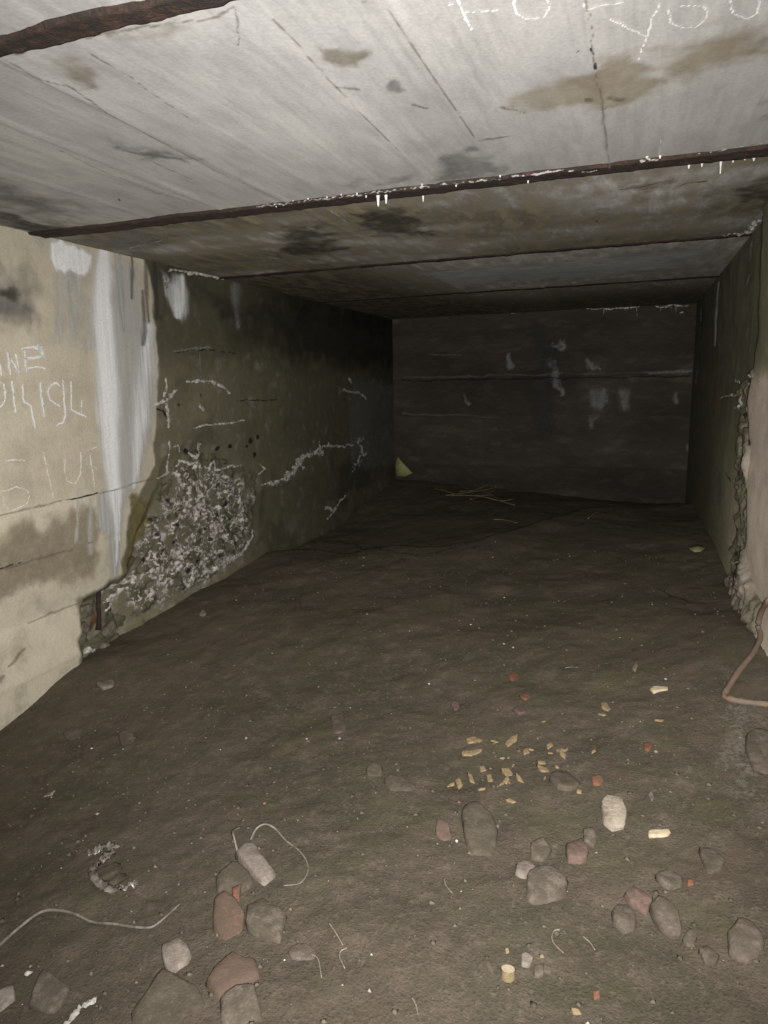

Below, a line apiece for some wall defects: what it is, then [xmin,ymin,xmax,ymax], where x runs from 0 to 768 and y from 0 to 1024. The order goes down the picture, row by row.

leakage [529,61,657,107]
leakage [0,213,239,595]
spalling [79,444,257,658]
crack [156,399,353,486]
spalling [720,369,763,635]